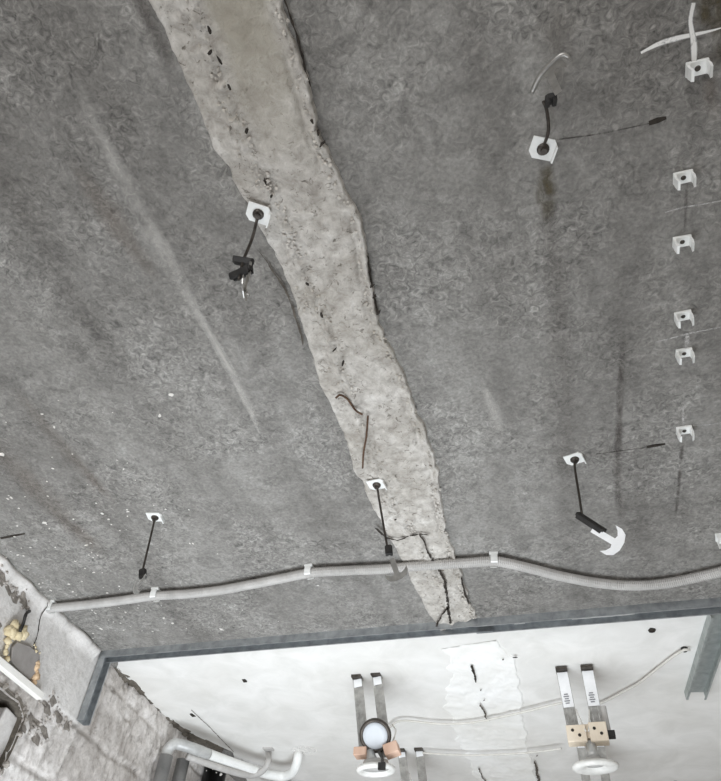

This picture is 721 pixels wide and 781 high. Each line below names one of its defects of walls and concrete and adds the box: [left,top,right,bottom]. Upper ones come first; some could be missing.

peeling [274,11,453,559]
spalling [0,564,30,610]
crack [375,528,469,627]
spalling [0,682,72,775]